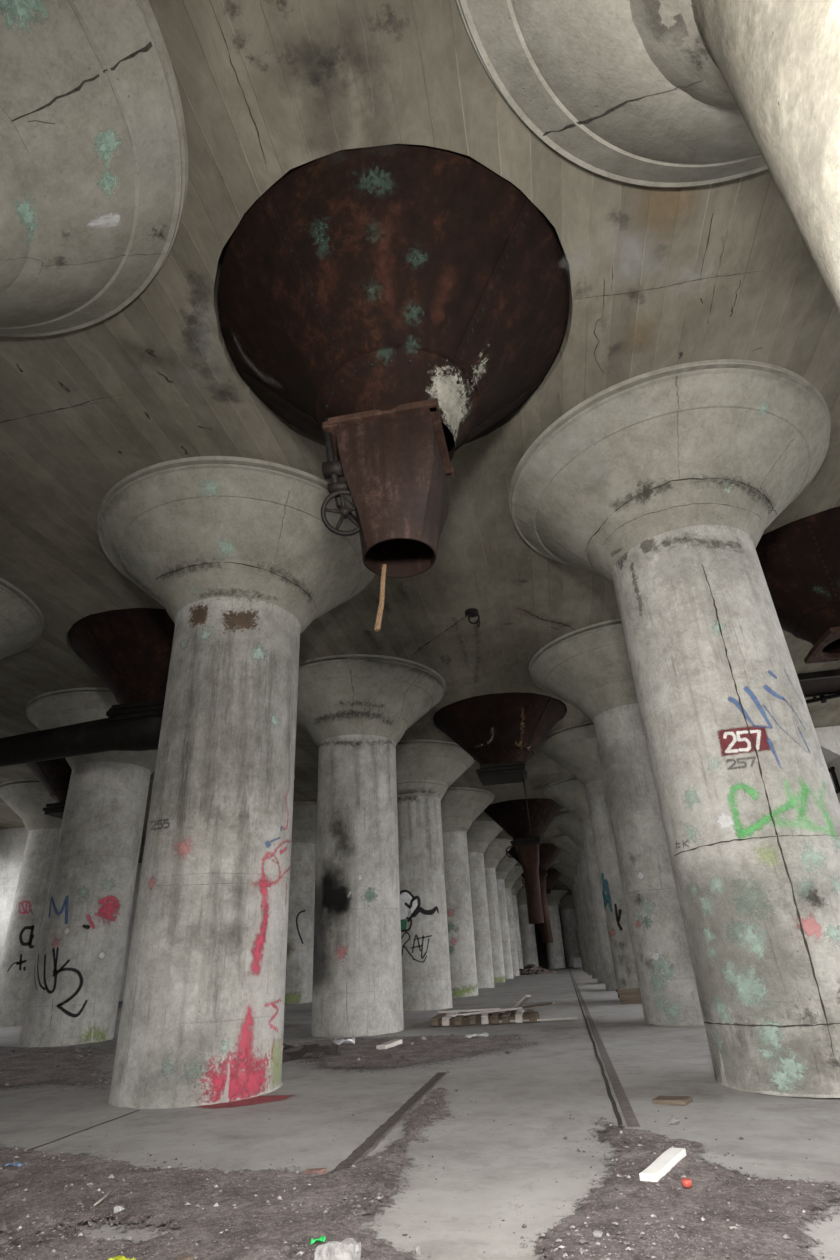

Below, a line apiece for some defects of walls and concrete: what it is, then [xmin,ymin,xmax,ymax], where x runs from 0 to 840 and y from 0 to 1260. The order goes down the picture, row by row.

crack [0,1,156,153]
crack [543,81,702,136]
rust [188,602,208,627]
rust [223,610,260,632]
crack [674,564,840,1067]